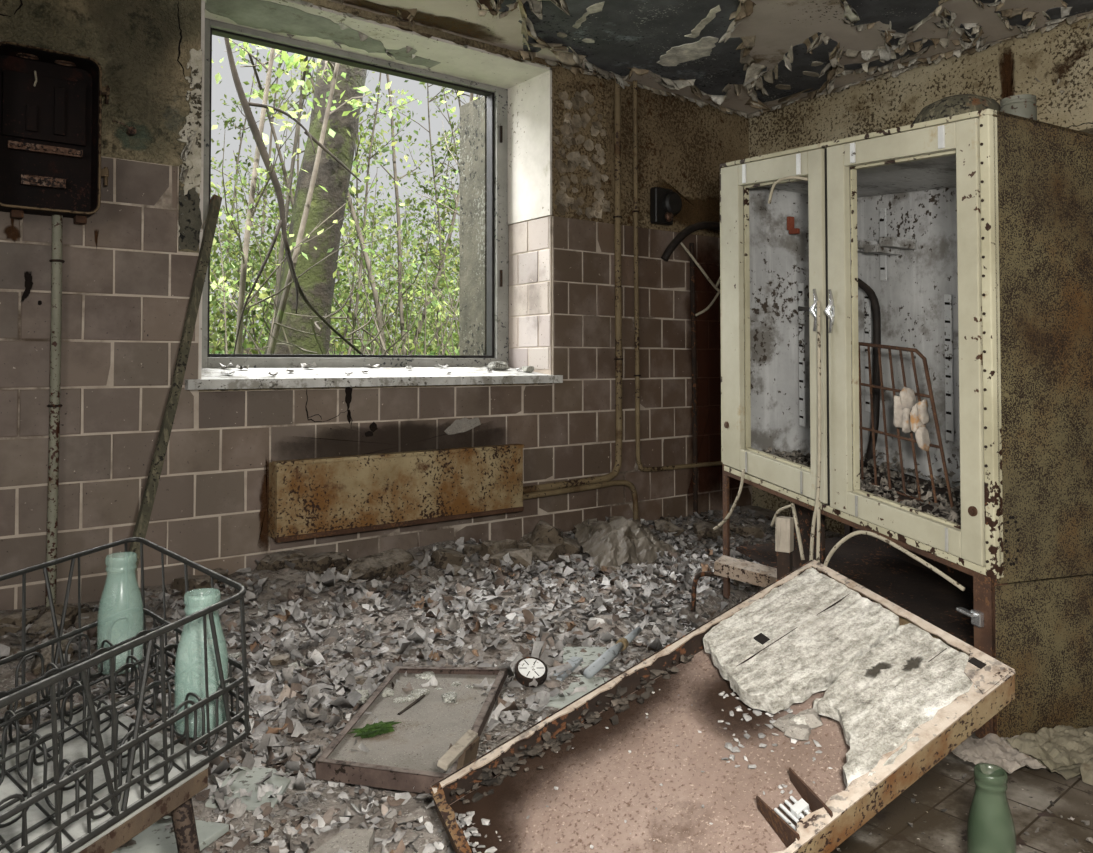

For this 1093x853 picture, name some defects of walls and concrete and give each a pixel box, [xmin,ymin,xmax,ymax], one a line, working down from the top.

peeling [205,0,441,72]
peeling [450,0,1093,218]
damp [659,180,720,233]